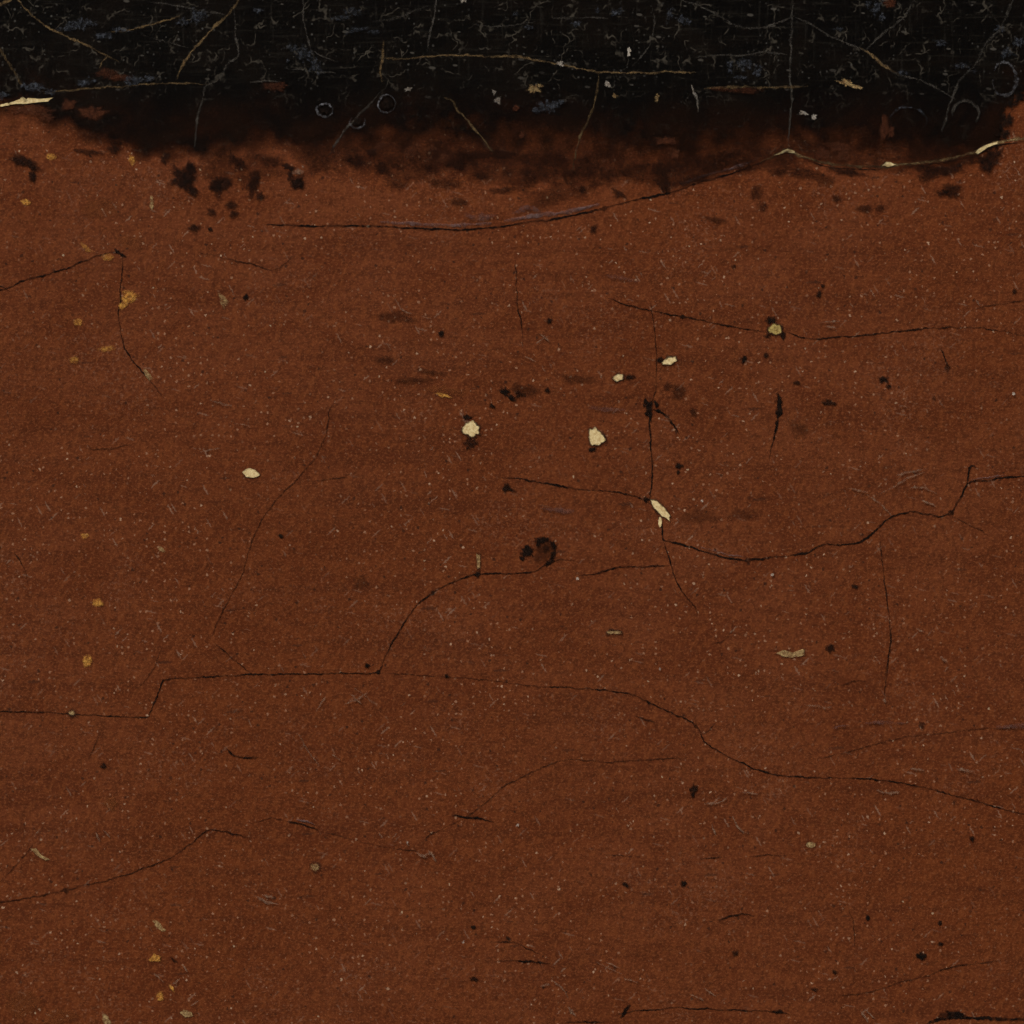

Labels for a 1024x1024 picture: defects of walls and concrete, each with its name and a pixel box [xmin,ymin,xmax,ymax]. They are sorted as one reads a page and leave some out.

crack [418,0,690,108]
water stain [900,94,1023,197]
water stain [10,154,39,182]
water stain [161,153,197,197]
water stain [210,177,238,217]
crack [267,205,598,231]
peeling [461,414,481,449]
peeling [589,427,606,452]
peeling [243,468,260,478]
peeling [643,496,670,527]
crack [584,465,1024,691]
crack [0,562,553,718]